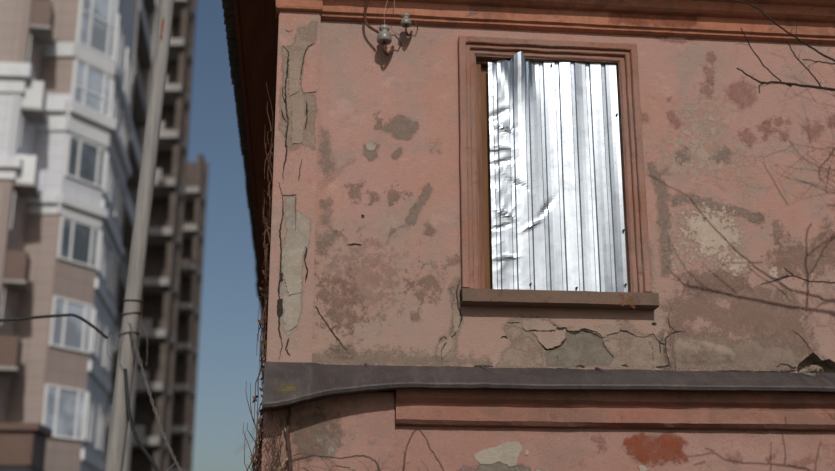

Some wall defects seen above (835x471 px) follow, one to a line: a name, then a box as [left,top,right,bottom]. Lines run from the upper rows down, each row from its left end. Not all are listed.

flaking render [279,21,318,150]
peeling [375,113,418,159]
peeling [345,183,431,224]
peeling [648,162,763,285]
flaking render [280,194,311,335]
crack [316,307,347,351]
crack [440,280,463,357]
crack [501,307,681,369]
peeling [797,280,835,331]
crack [719,363,797,372]
flaking render [797,356,835,373]
peeling [459,442,554,471]